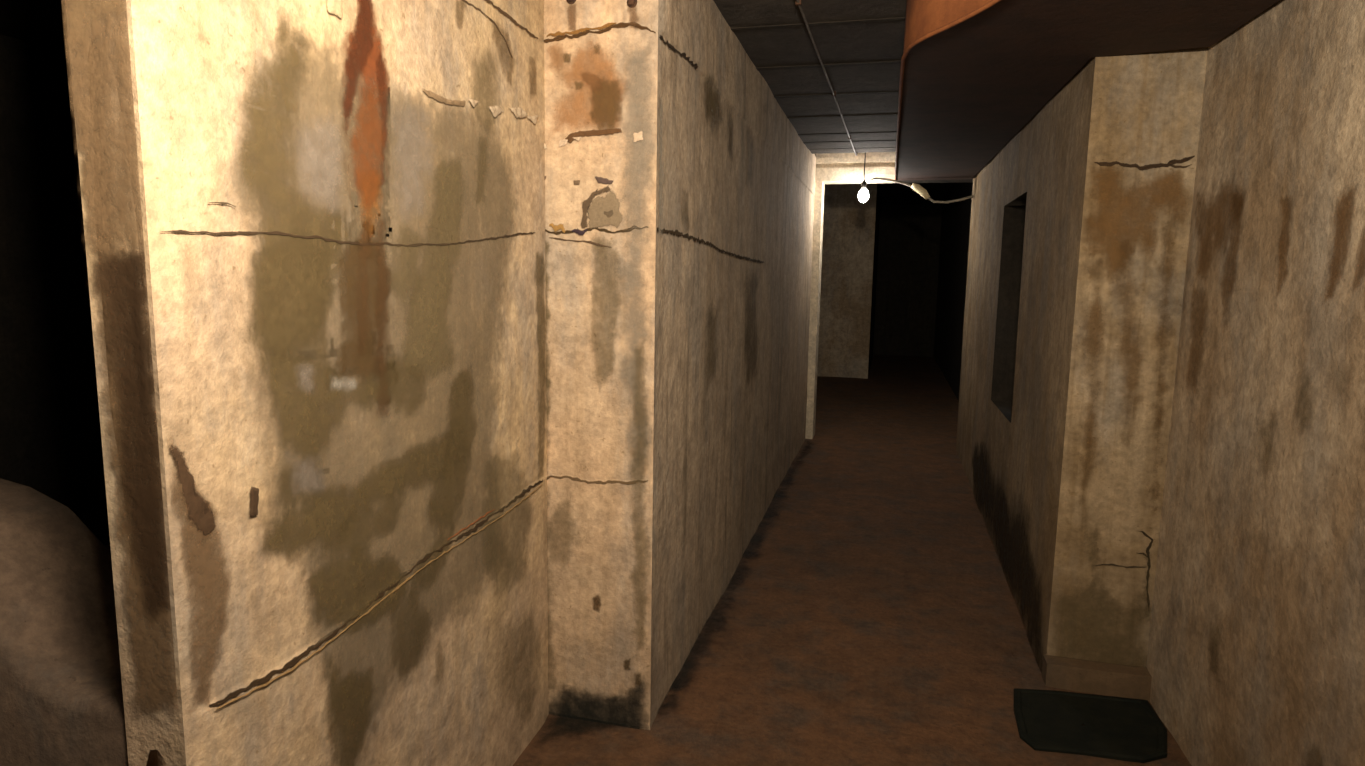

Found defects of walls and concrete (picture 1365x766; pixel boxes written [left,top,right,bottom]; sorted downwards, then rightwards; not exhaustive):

crack [464,0,698,69]
rust [560,47,623,129]
rust [343,0,388,311]
crack [161,189,764,263]
spalling [574,176,622,228]
crack [1094,155,1195,171]
damp [238,30,513,766]
damp [536,243,550,475]
crack [209,475,648,710]
damp [662,441,811,707]
damp [543,683,644,740]